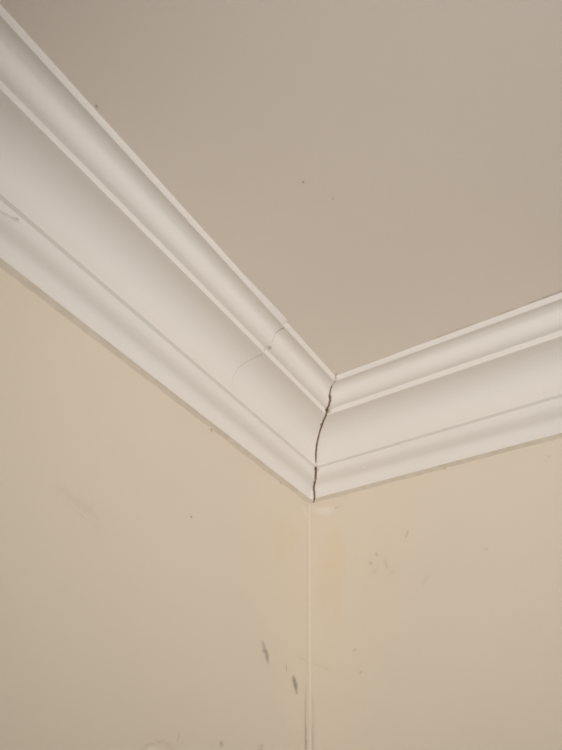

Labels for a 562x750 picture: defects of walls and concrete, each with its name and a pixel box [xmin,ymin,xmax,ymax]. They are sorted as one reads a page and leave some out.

crack [313,372,337,503]